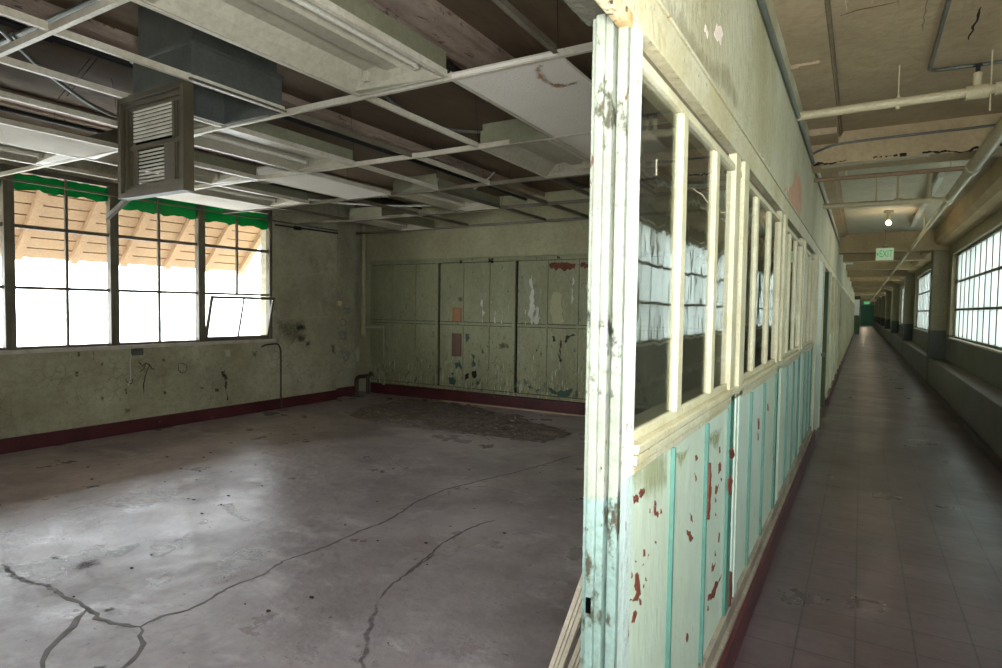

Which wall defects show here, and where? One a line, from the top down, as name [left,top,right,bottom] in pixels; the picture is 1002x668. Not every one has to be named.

peeling [704,24,723,45]
crack [840,0,899,16]
crack [968,7,981,40]
spalling [922,146,979,154]
peeling [525,275,541,324]
peeling [549,256,588,304]
peeling [448,354,479,385]
peeling [695,447,735,520]
crack [1,456,571,668]
peeling [630,549,650,623]
peeling [707,533,732,611]